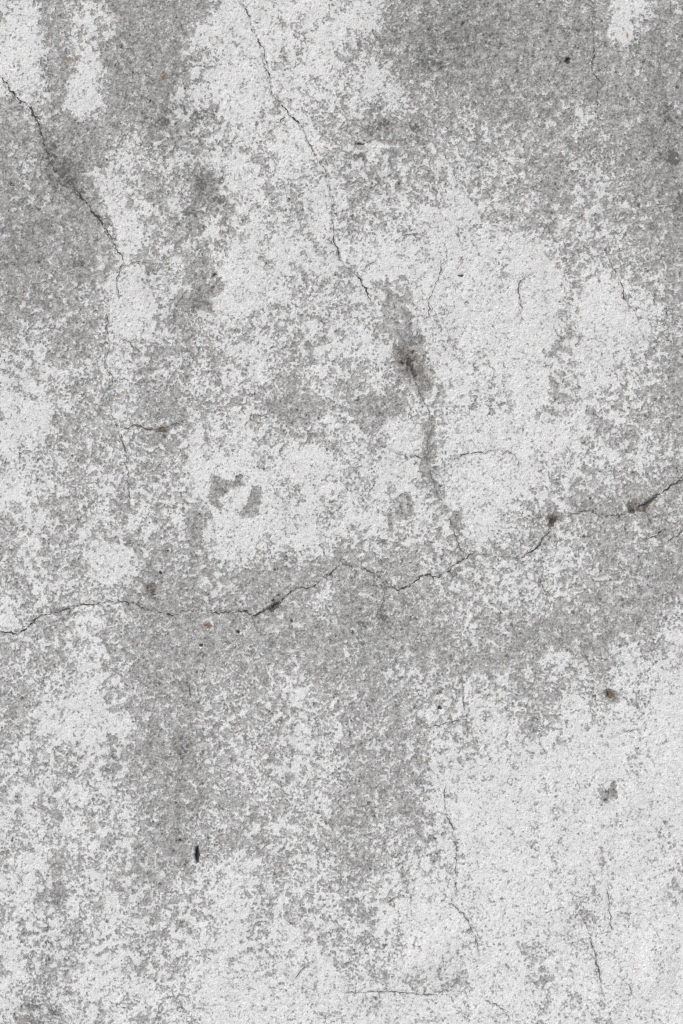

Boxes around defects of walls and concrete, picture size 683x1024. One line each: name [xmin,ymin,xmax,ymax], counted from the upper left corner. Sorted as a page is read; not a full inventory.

crack [240,0,378,306]
crack [0,77,183,512]
crack [403,232,448,347]
crack [0,380,683,647]
crack [442,783,480,956]